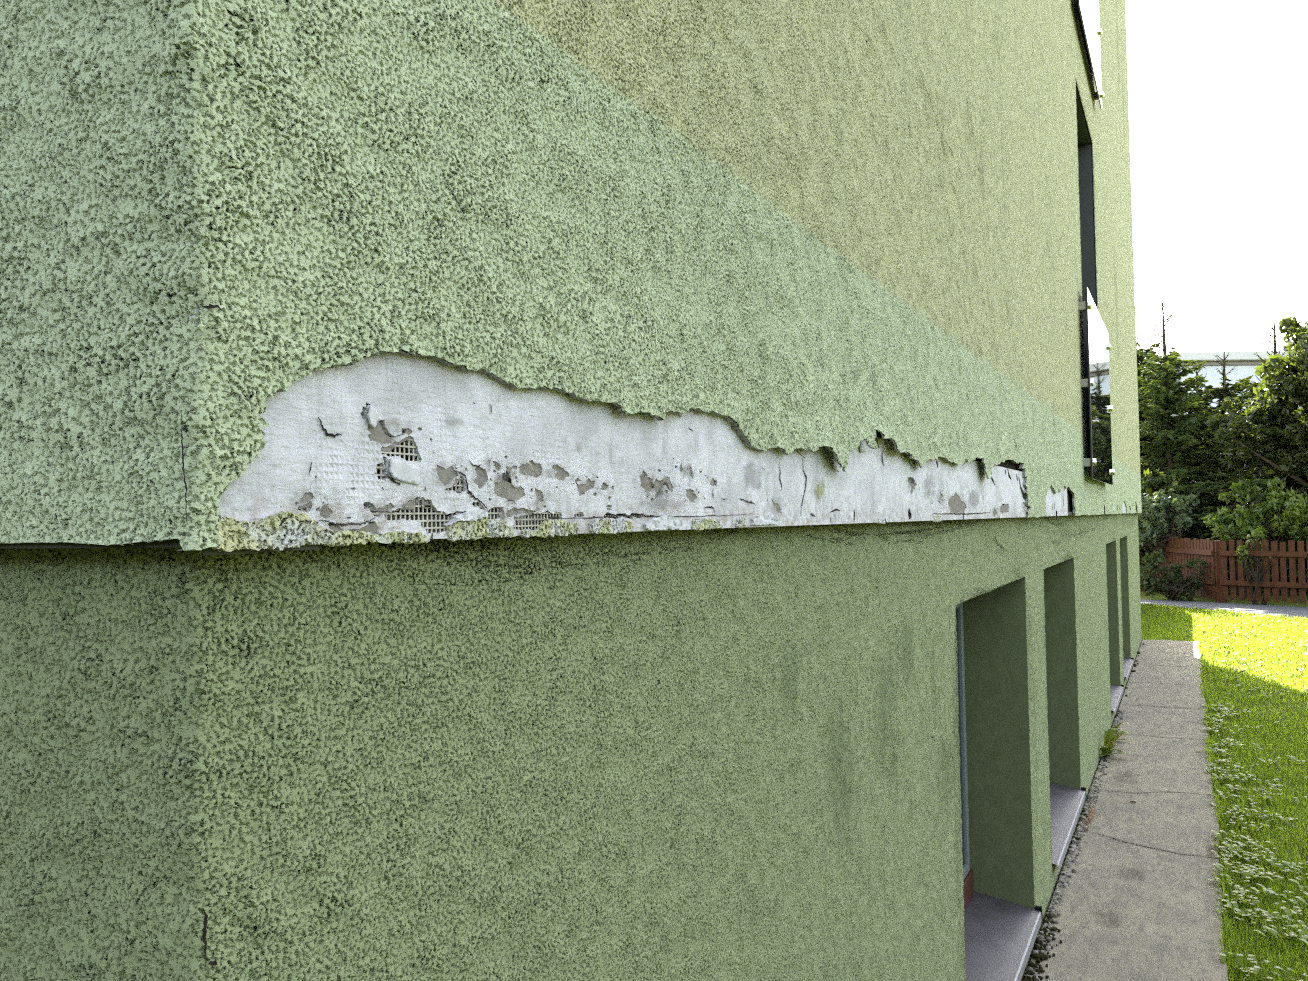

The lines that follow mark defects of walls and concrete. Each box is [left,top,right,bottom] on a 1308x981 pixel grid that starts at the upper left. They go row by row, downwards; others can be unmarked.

peeling [210,350,1029,552]
peeling [1046,484,1068,520]